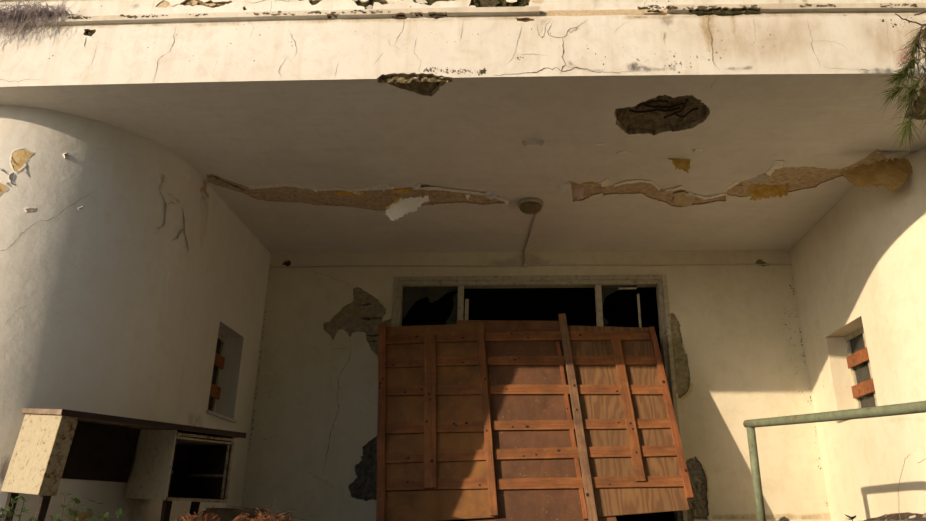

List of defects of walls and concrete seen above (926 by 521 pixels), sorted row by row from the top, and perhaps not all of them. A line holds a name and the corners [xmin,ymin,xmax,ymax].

spalling [156,0,232,8]
spalling [353,0,388,9]
spalling [392,0,447,18]
crack [498,20,640,76]
spalling [379,74,453,92]
spalling [615,95,708,130]
peeling [0,147,35,197]
spalling [200,174,509,221]
spalling [571,148,914,207]
spalling [324,288,391,358]
spalling [349,437,377,501]
spalling [686,457,710,521]